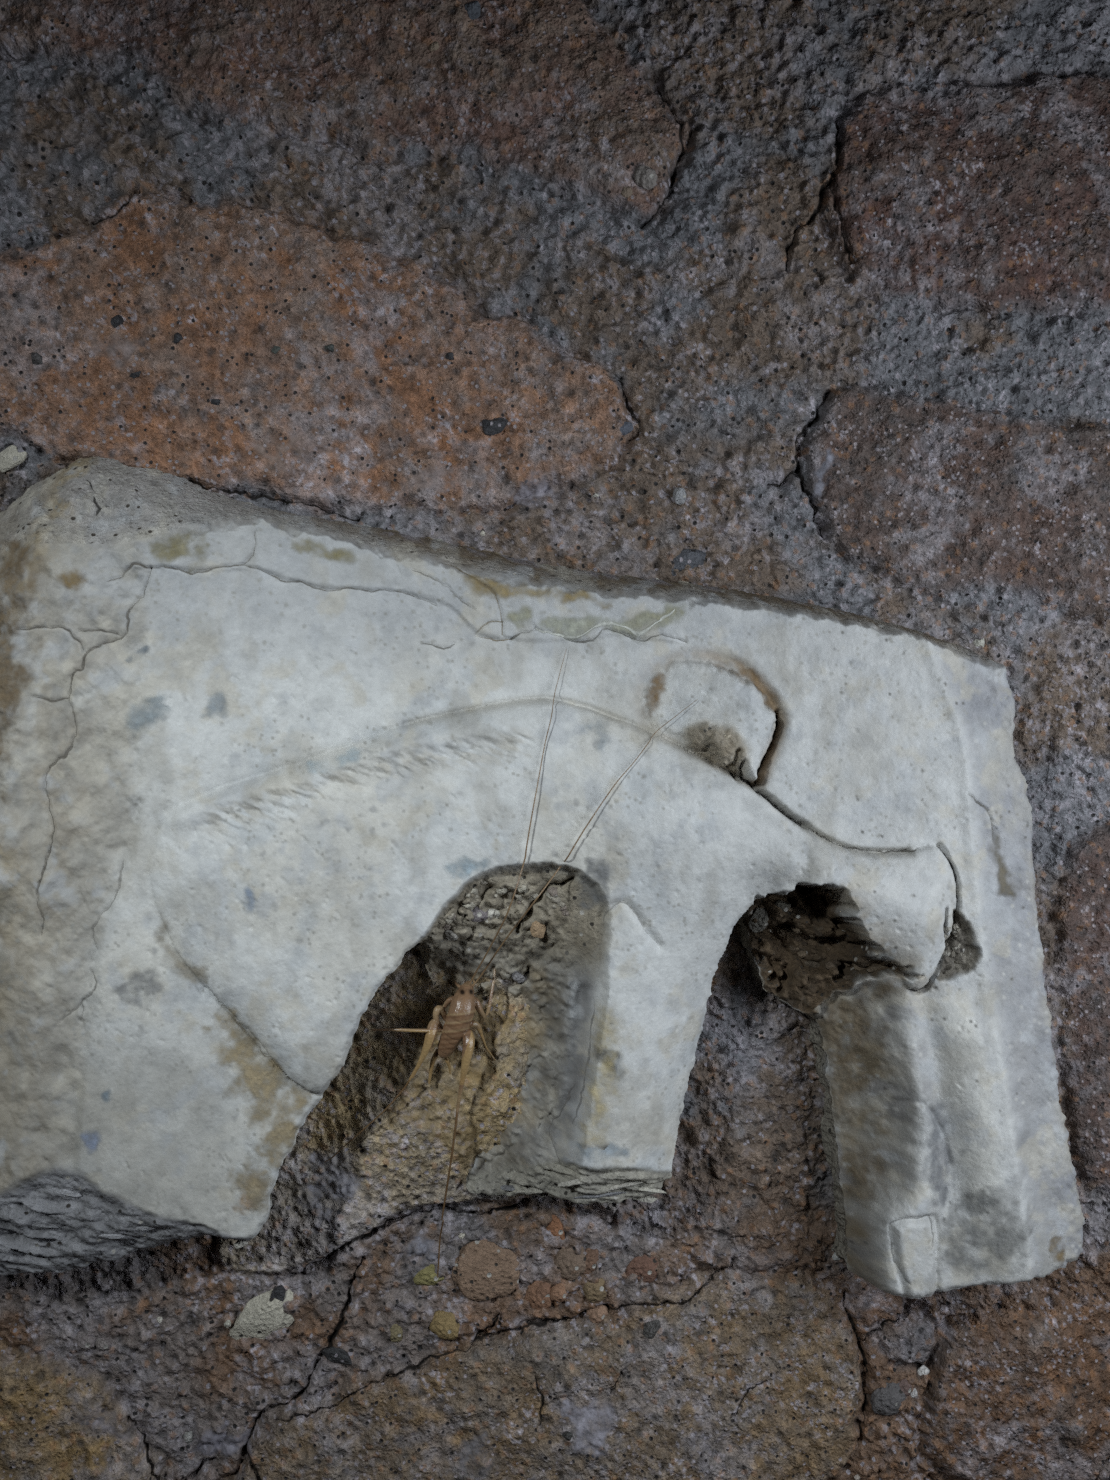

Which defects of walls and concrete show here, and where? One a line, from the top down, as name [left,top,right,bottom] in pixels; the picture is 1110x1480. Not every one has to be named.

crack [642,89,684,228]
crack [786,123,852,271]
crack [618,380,640,430]
crack [768,394,827,535]
crack [244,1198,733,1480]
crack [843,1215,934,1433]
crack [135,1421,204,1480]